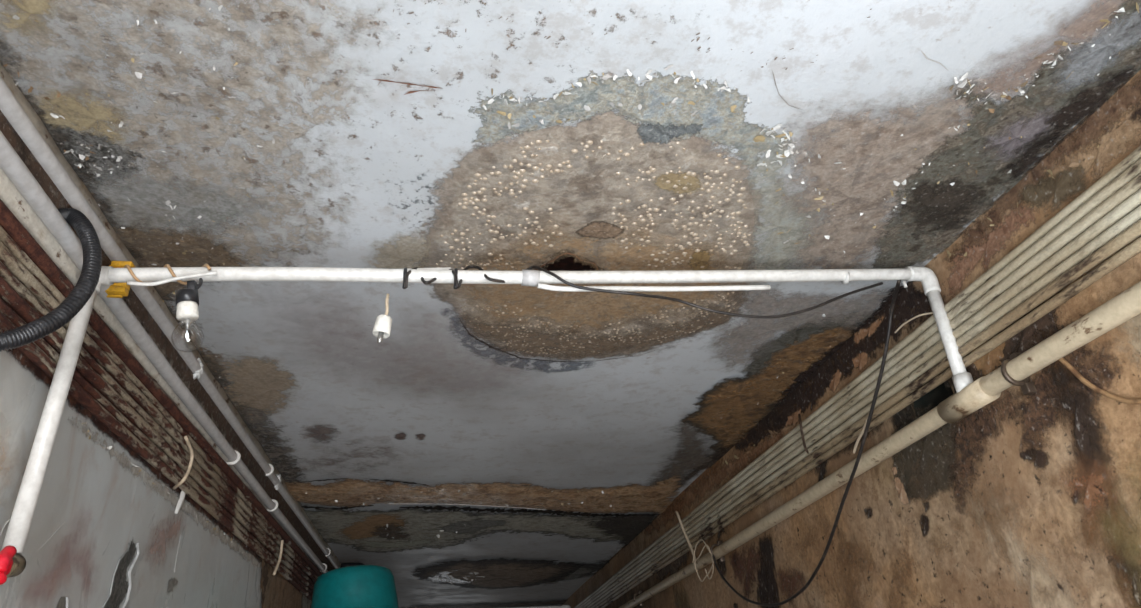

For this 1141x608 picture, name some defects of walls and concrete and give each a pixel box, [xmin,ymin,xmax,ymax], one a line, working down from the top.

water stain [0,0,379,268]
peeling [468,65,795,170]
water stain [373,0,1141,452]
corrosion [5,348,52,387]
water stain [153,282,304,484]
corrosion [66,394,273,563]
water stain [411,513,657,590]
peeling [301,430,784,553]
water stain [716,347,1141,608]